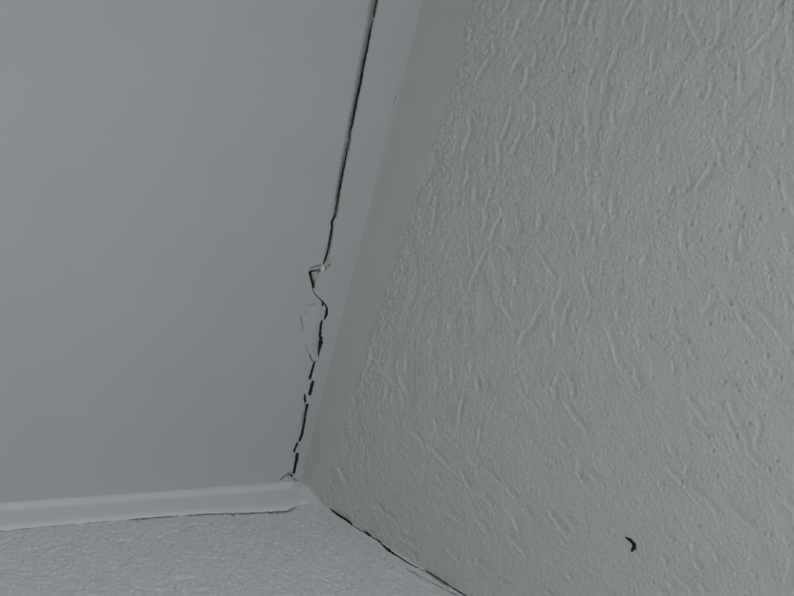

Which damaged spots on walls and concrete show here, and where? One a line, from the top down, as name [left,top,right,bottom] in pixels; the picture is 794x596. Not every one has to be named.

crack [281,0,378,481]
crack [329,508,466,596]